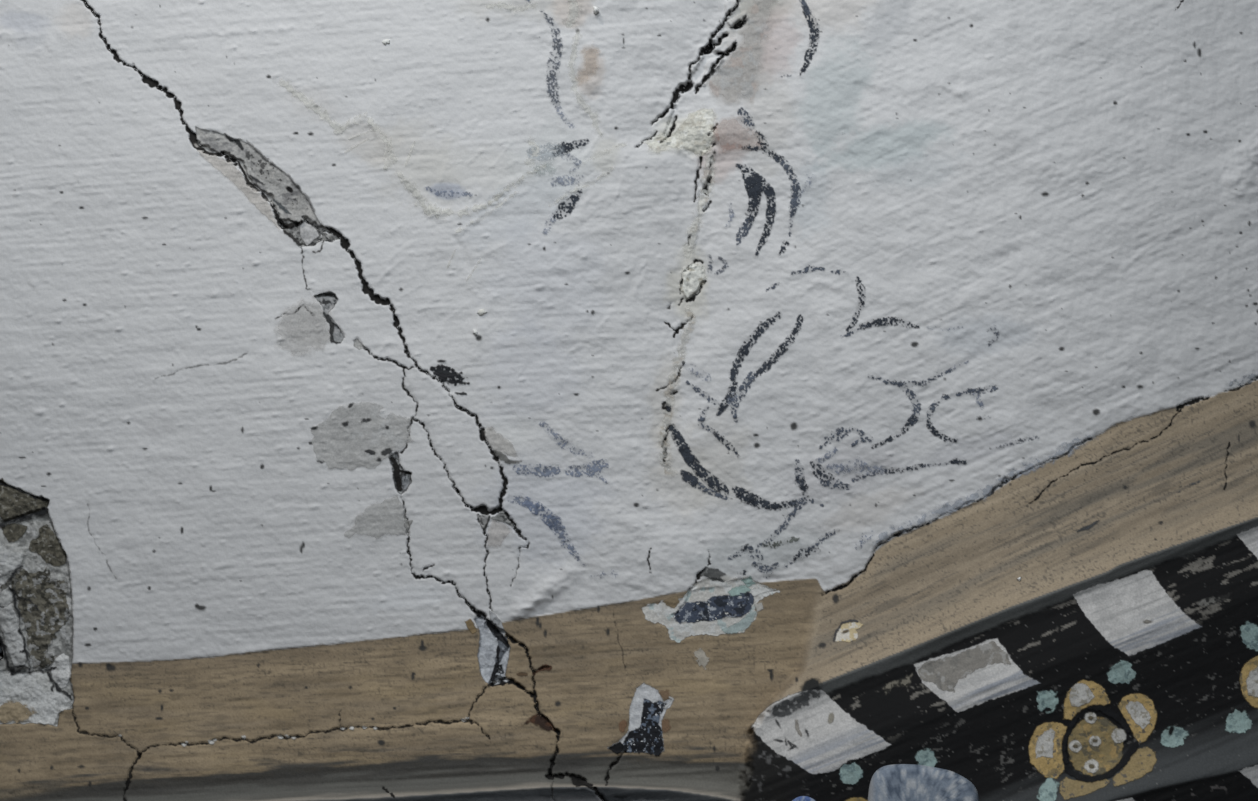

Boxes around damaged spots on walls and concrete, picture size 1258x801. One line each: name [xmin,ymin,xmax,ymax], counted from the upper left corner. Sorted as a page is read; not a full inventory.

crack [636,0,746,147]
spalling [195,126,340,246]
crack [656,123,718,464]
crack [72,0,626,801]
spalling [0,478,74,726]
spalling [465,611,510,686]
peeling [608,683,674,756]
peeling [641,567,780,670]